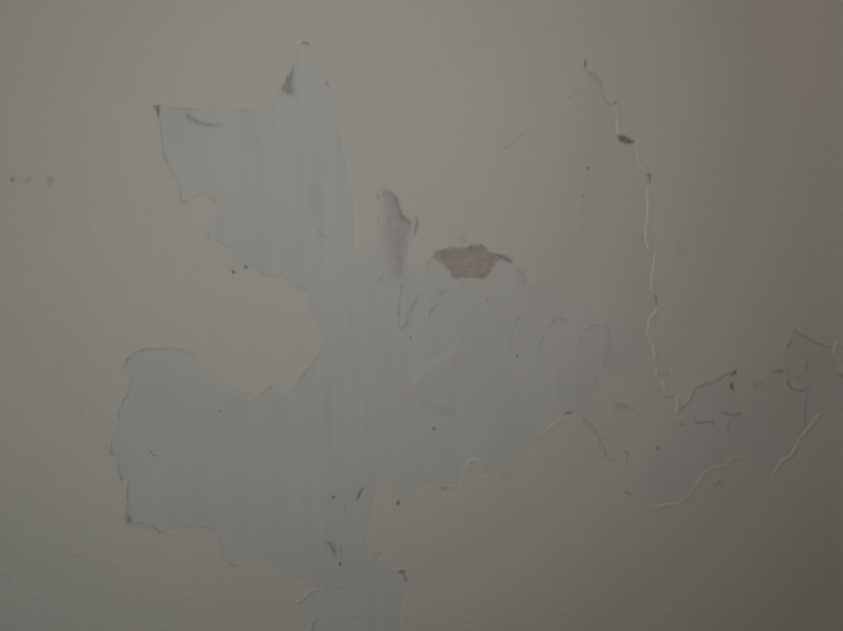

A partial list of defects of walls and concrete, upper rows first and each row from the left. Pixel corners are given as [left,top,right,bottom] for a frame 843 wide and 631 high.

flaking render [425,240,515,284]